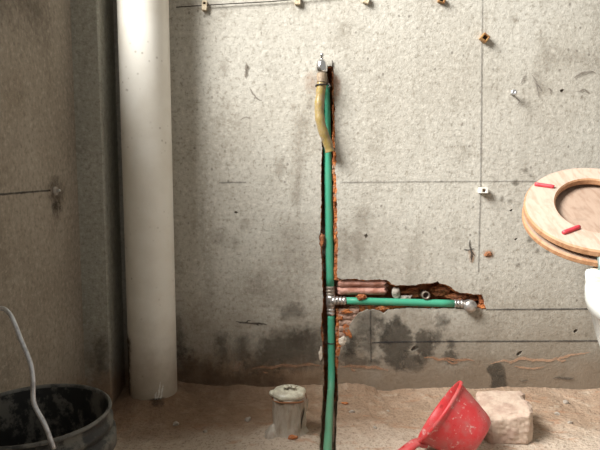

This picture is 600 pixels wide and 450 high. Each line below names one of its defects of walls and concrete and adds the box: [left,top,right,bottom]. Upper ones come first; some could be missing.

spalling [328,66,365,281]
spalling [374,279,486,309]
spalling [335,294,454,399]
water stain [381,320,432,370]
water stain [487,363,506,388]
crack [491,352,587,370]